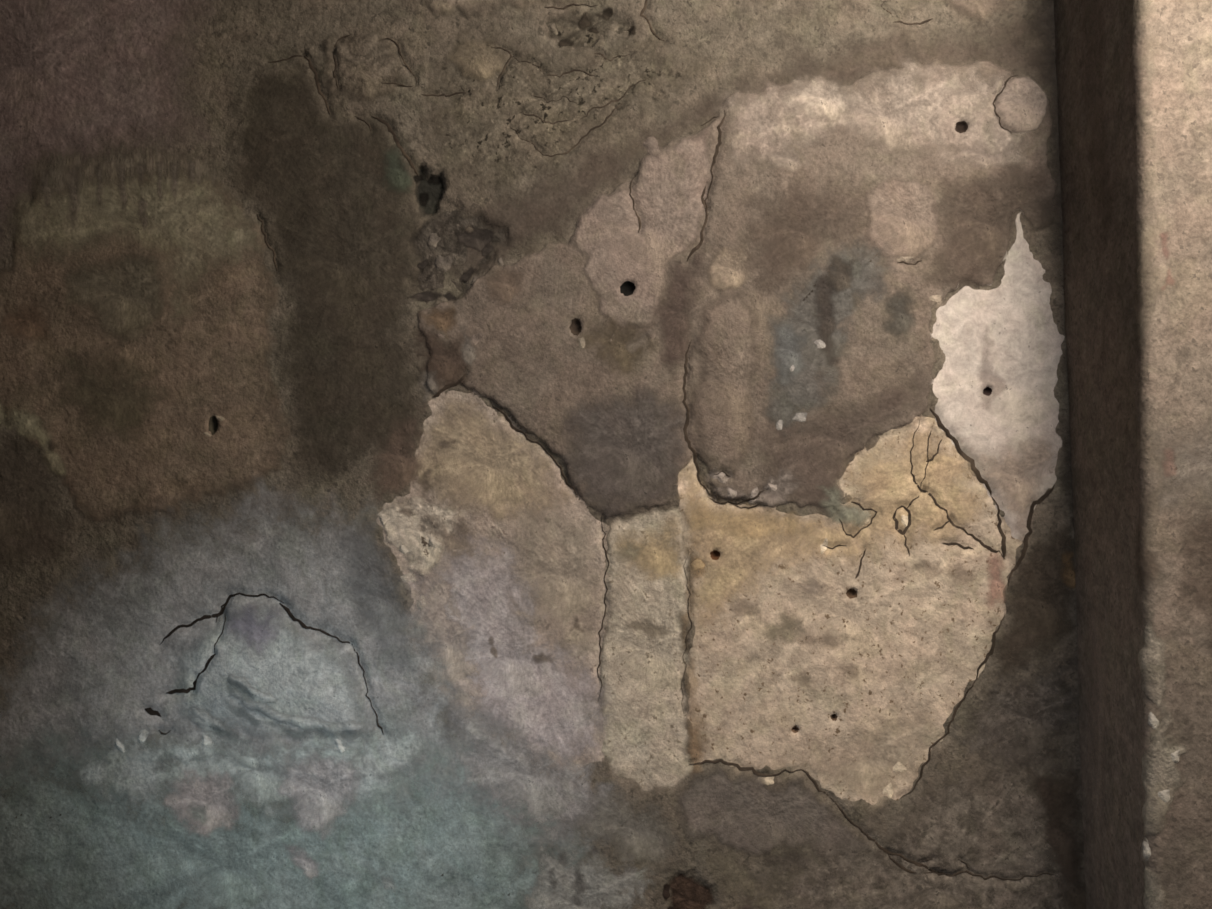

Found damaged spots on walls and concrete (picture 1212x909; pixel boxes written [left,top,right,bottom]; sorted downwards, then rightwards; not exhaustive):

crack [270,34,419,176]
crack [379,38,465,97]
crack [489,45,648,157]
crack [545,2,596,10]
crack [640,0,664,41]
crack [881,1,933,25]
crack [687,113,726,261]
crack [682,340,764,509]
flaking render [376,8,1076,909]
crack [145,592,384,735]
crack [824,408,1055,798]
crack [691,759,1054,881]